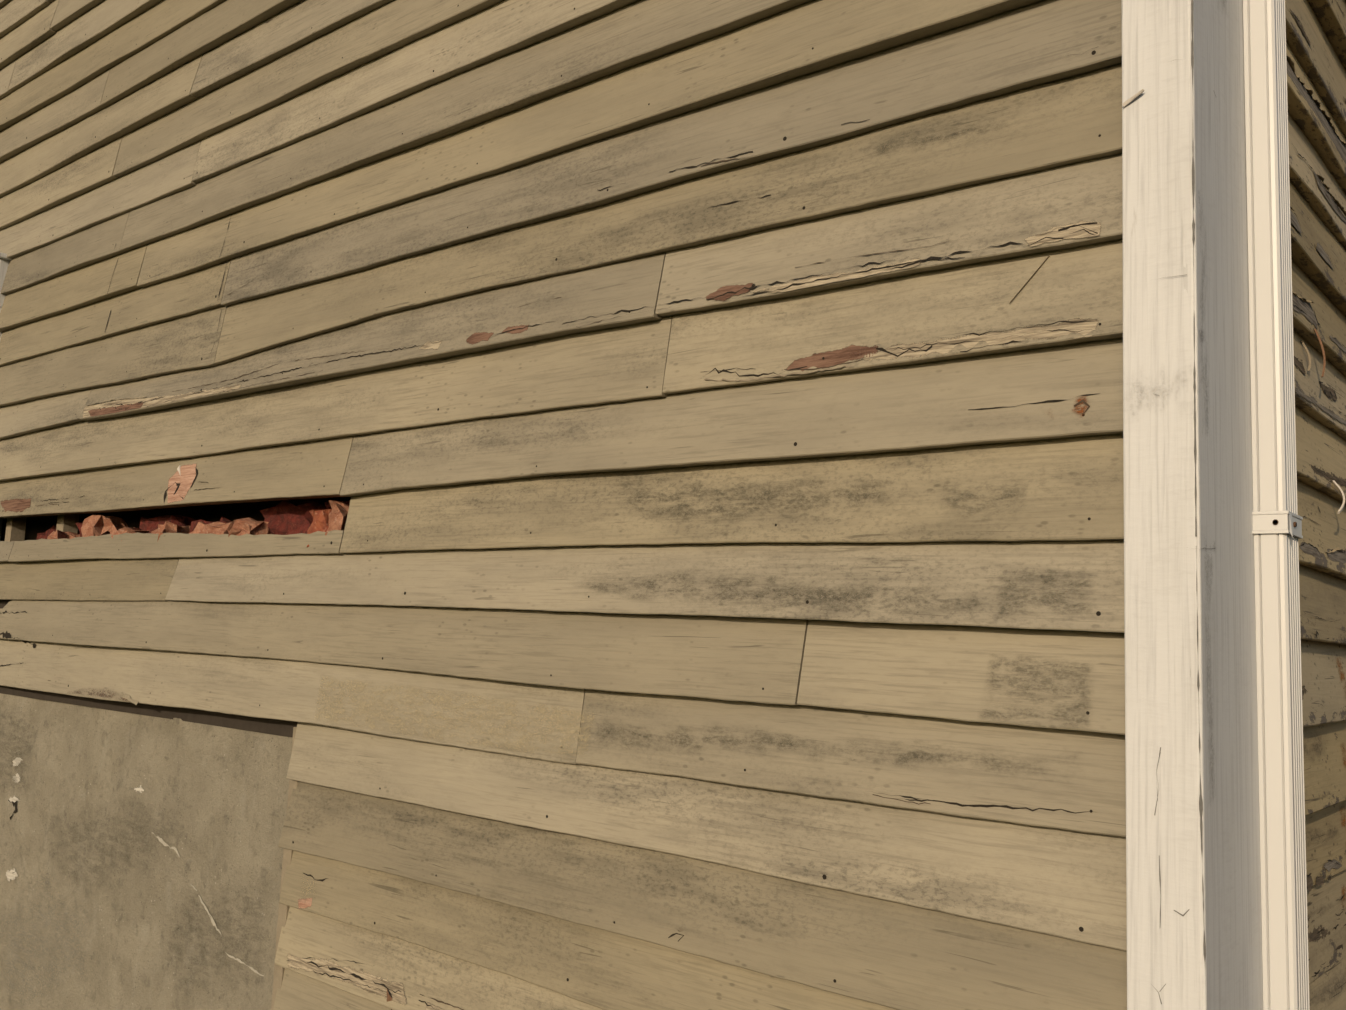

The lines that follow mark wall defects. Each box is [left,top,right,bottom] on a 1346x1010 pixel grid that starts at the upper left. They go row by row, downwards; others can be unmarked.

peeling [1286,55,1346,164]
peeling [1293,145,1346,223]
peeling [1290,206,1337,270]
peeling [706,259,920,301]
peeling [466,324,530,345]
peeling [787,318,1098,371]
peeling [1292,292,1346,353]
peeling [1294,356,1346,425]
spalling [1,464,351,547]
peeling [1332,480,1345,514]
peeling [1299,542,1346,564]